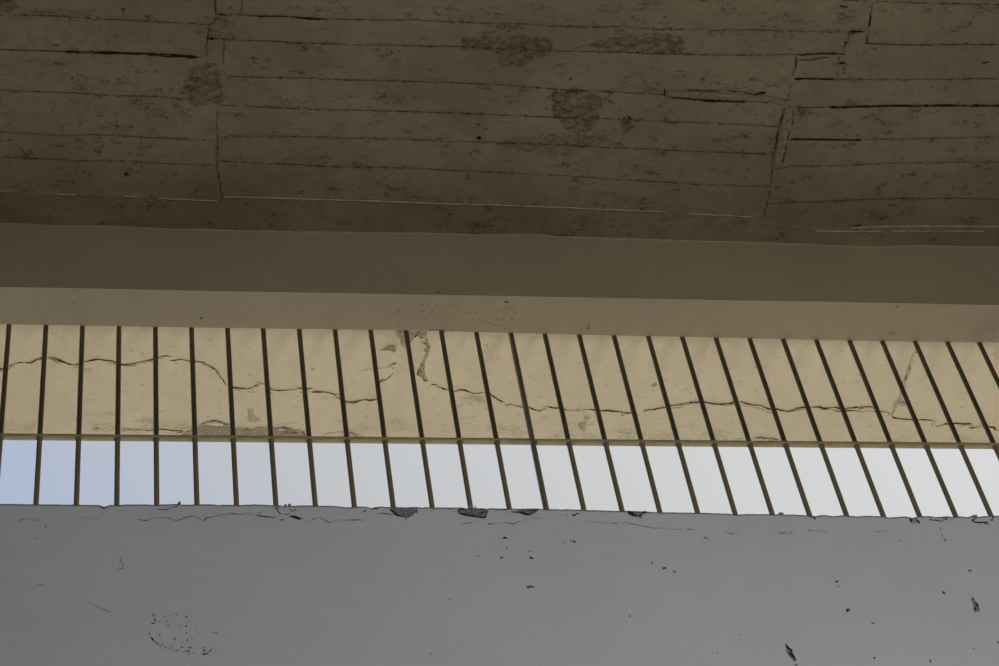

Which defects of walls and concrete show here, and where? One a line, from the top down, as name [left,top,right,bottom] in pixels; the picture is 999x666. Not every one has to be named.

crack [0,355,396,404]
flaking render [396,330,430,381]
crack [431,384,999,431]